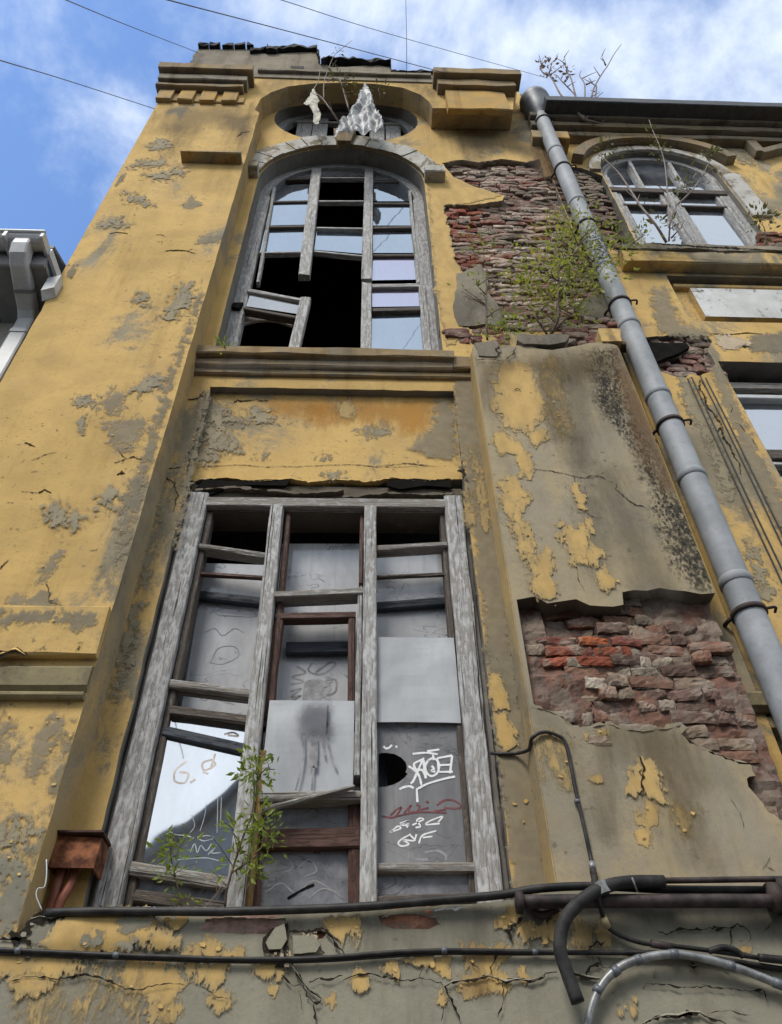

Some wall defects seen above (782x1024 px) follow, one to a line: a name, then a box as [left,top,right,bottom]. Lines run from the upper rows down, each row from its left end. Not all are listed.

flaking render [442,159,603,332]
flaking render [573,170,627,252]
peeling [0,278,205,634]
crack [535,469,646,518]
leakage [584,348,711,590]
peeling [648,285,782,539]
flaking render [106,380,782,894]
crack [12,973,228,999]
flaking render [199,915,286,956]
crack [262,917,612,1024]
crack [642,983,767,1024]
crack [659,922,773,945]